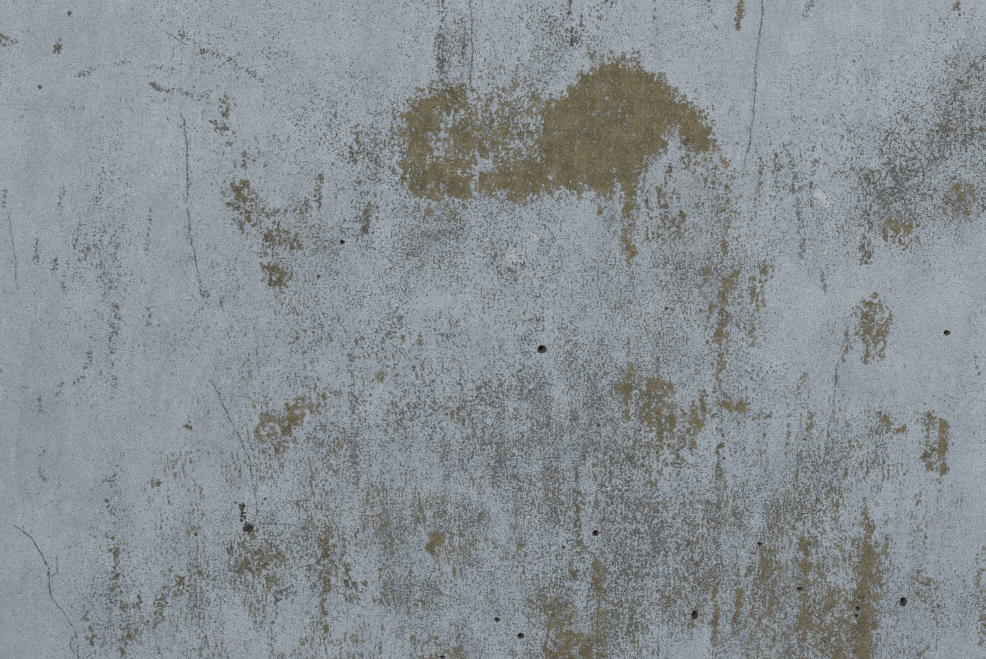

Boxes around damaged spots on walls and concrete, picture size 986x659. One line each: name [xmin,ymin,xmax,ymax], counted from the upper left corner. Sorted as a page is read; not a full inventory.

peeling [209,94,236,147]
crack [744,0,765,162]
peeling [221,137,324,294]
peeling [348,47,774,487]
peeling [841,292,894,364]
peeling [253,387,339,457]
peeling [319,428,350,475]
peeling [918,410,953,484]
crack [14,525,79,659]
peeling [535,467,609,659]
peeling [705,497,890,659]